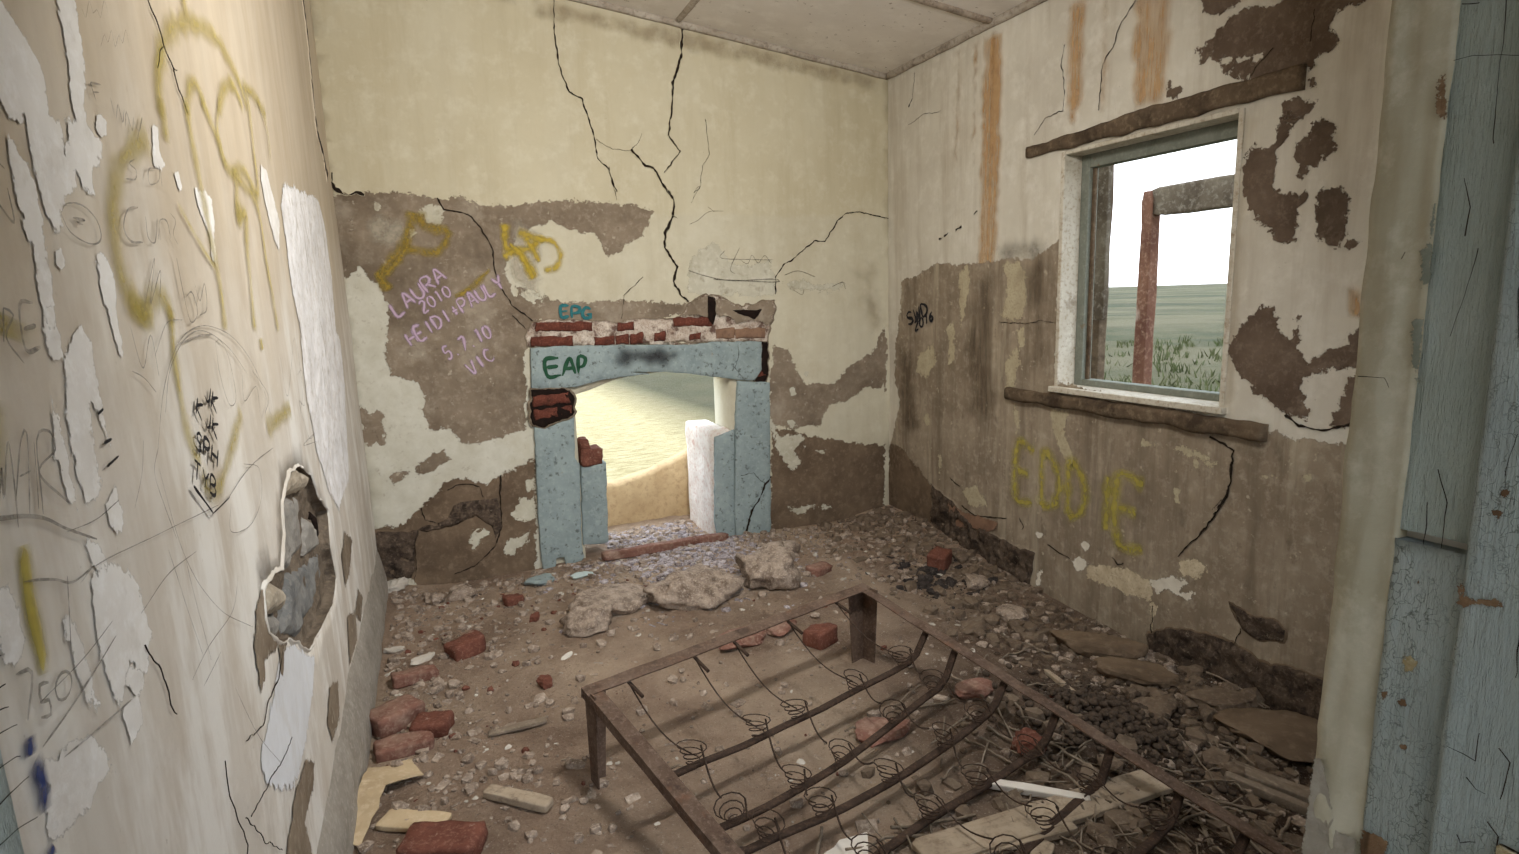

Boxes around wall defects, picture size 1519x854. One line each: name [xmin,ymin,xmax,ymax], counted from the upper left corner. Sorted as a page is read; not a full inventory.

peeling [0,0,124,535]
crack [553,7,710,319]
corrosion [975,37,1001,264]
corrosion [1134,0,1165,103]
peeling [1166,80,1183,100]
peeling [1194,0,1366,250]
peeling [333,190,1359,720]
crack [1178,436,1235,557]
peeling [0,585,26,668]
peeling [62,538,152,745]
spalling [254,464,363,854]
peeling [41,734,116,841]